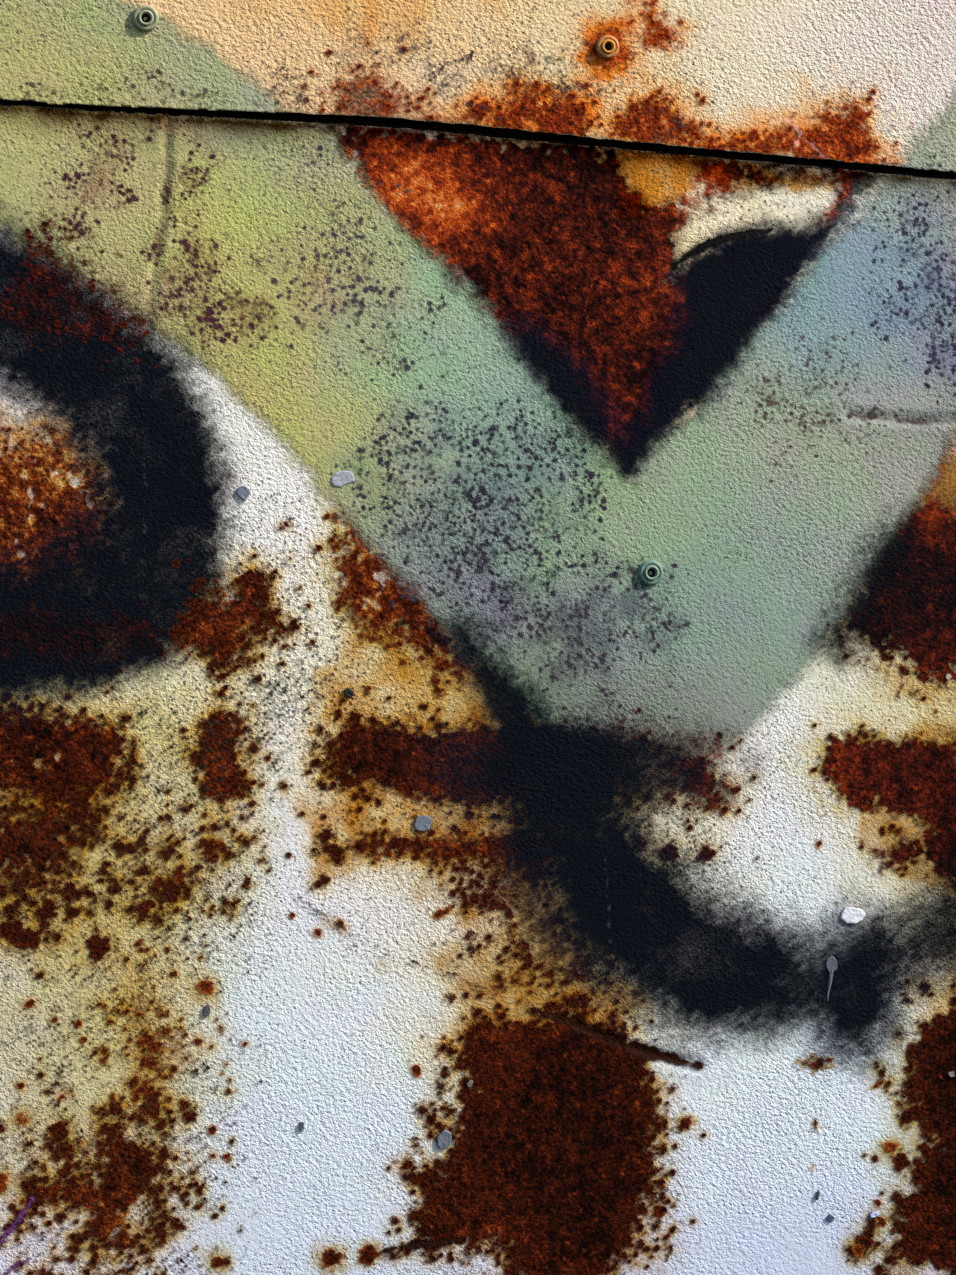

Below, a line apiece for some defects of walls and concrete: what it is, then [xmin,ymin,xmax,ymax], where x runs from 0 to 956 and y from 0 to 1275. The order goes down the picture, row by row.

rust [82,69,219,108]
rust [273,66,309,109]
rust [306,0,901,697]
rust [863,187,956,395]
rust [0,422,107,579]
rust [834,438,956,713]
rust [0,547,696,1275]
rust [645,732,757,831]
rust [695,843,722,864]
rust [811,723,956,889]
rust [804,1057,833,1069]
rust [843,978,956,1275]